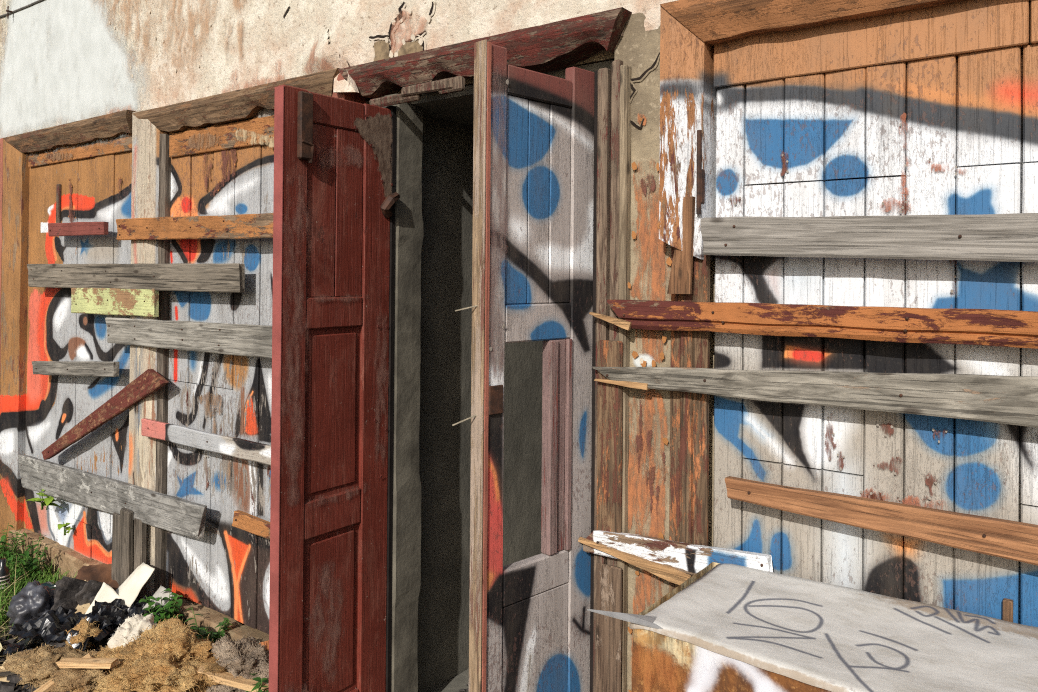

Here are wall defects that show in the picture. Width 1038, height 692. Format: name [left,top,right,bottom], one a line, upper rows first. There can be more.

flaking render [370,9,431,62]